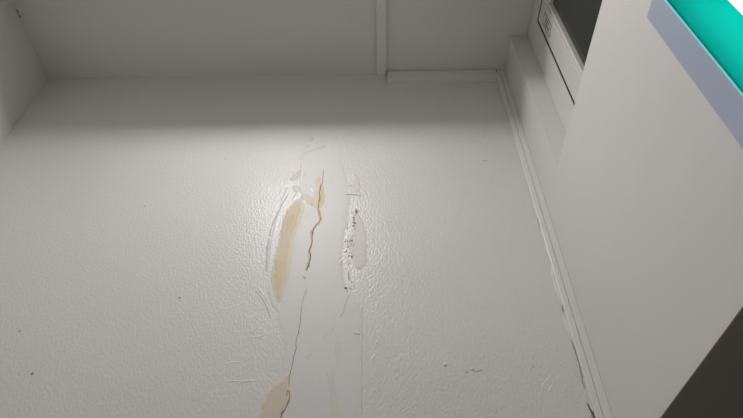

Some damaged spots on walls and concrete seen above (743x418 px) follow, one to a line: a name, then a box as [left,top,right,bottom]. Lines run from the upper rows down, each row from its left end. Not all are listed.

peeling [273,187,307,300]
water stain [265,170,325,312]
crack [280,169,324,418]